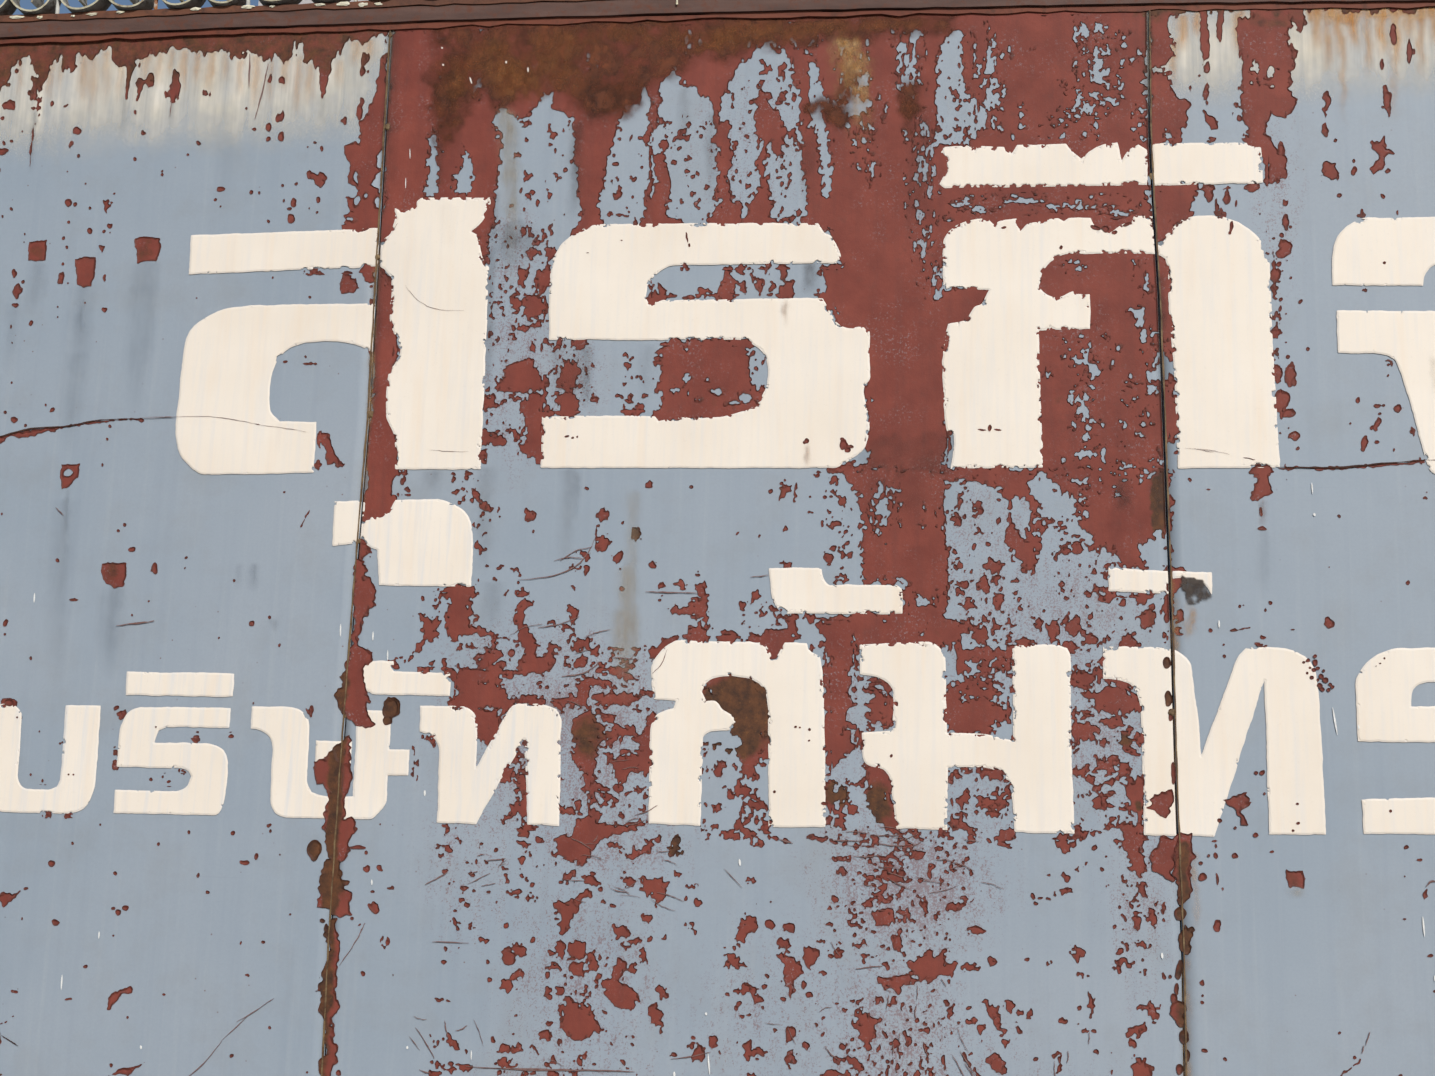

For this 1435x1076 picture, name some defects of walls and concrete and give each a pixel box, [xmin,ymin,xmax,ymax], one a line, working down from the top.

corrosion [433,15,953,139]
peeling [1322,136,1395,197]
peeling [134,236,161,264]
peeling [645,262,795,306]
peeling [1266,199,1303,450]
peeling [340,263,411,522]
crack [0,416,305,444]
peeling [314,431,345,470]
peeling [451,470,501,555]
peeling [1249,463,1287,530]
peeling [101,547,136,588]
peeling [725,974,810,1069]